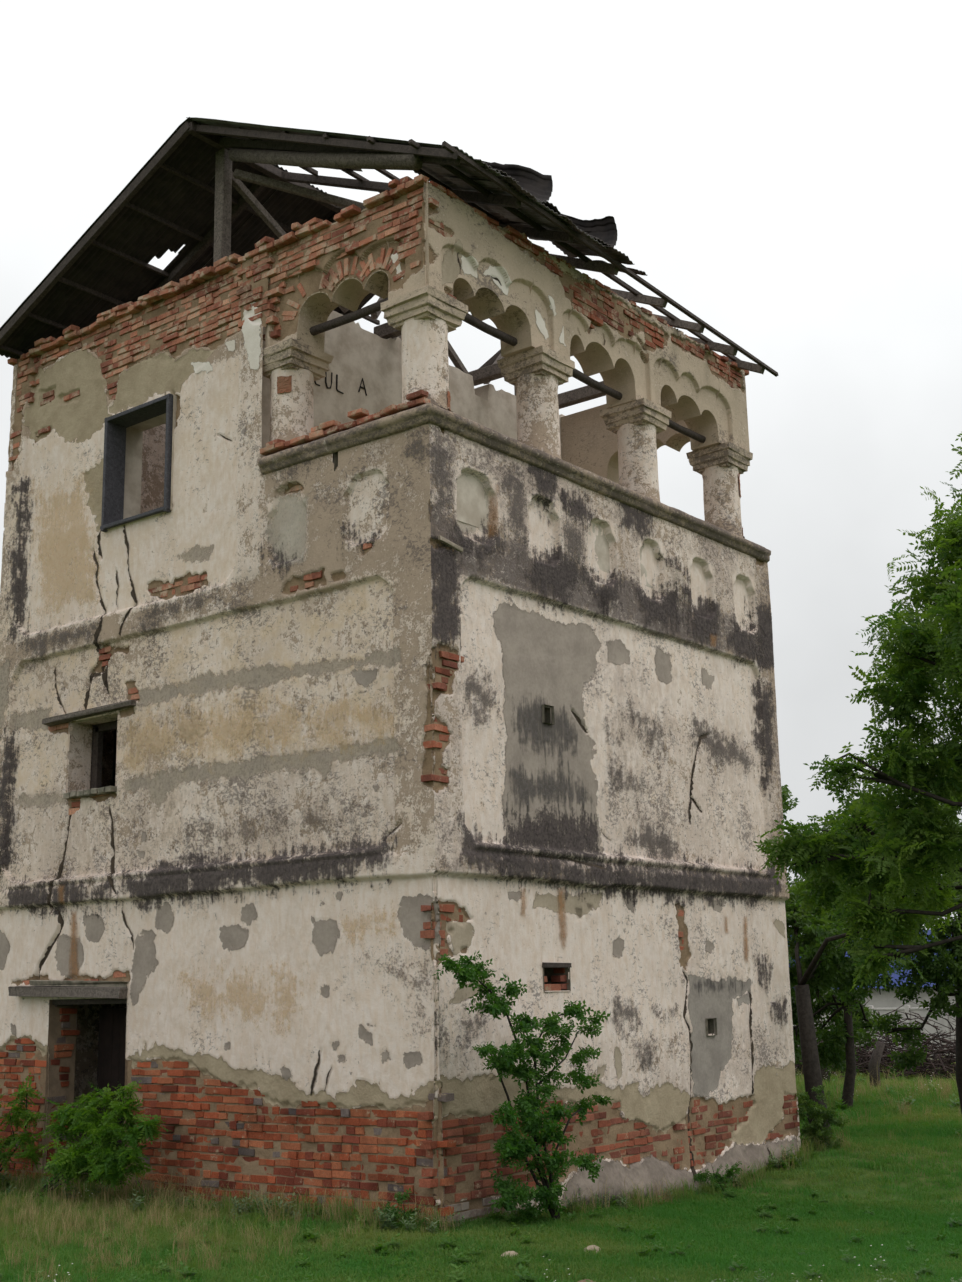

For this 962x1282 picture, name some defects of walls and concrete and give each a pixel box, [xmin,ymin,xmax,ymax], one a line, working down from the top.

spalling [8,186,463,471]
crack [53,525,137,713]
spalling [148,544,214,600]
water stain [404,428,776,797]
crack [39,815,72,980]
crack [107,807,134,950]
water stain [0,725,397,924]
spalling [421,643,464,793]
water stain [453,700,782,917]
crack [676,734,708,859]
spalling [0,1023,49,1183]
spalling [123,891,800,1223]